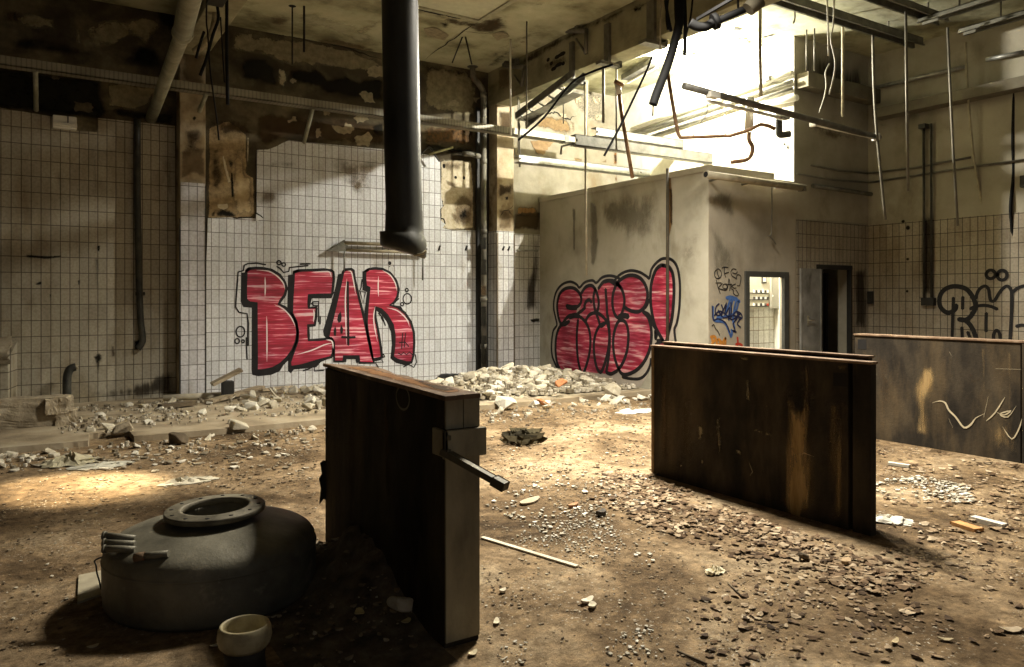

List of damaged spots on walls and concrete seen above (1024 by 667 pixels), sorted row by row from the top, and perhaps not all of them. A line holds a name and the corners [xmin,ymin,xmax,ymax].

peeling [208,111,383,221]
peeling [440,160,473,229]
water stain [591,201,647,263]